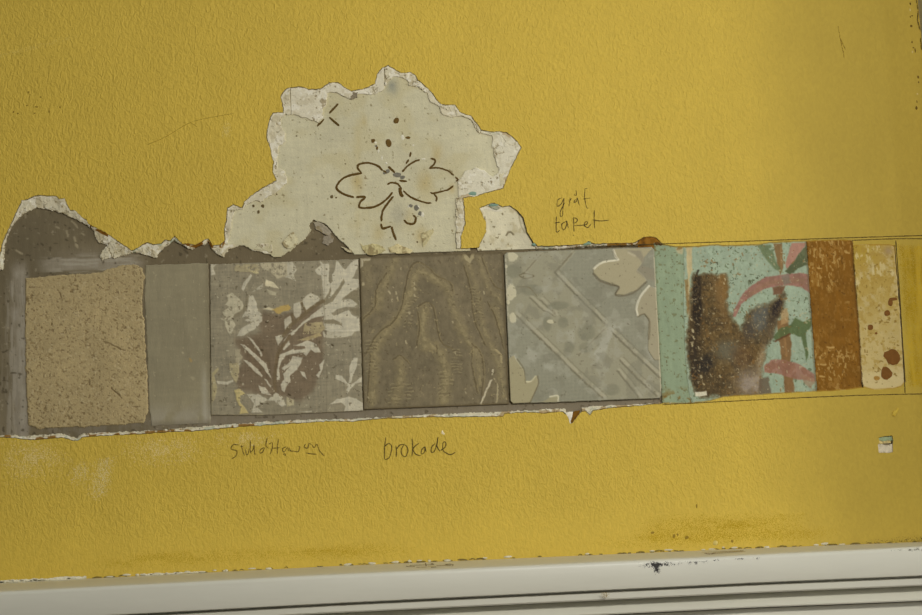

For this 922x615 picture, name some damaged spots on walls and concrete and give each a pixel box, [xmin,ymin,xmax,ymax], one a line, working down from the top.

peeling [0,65,662,441]